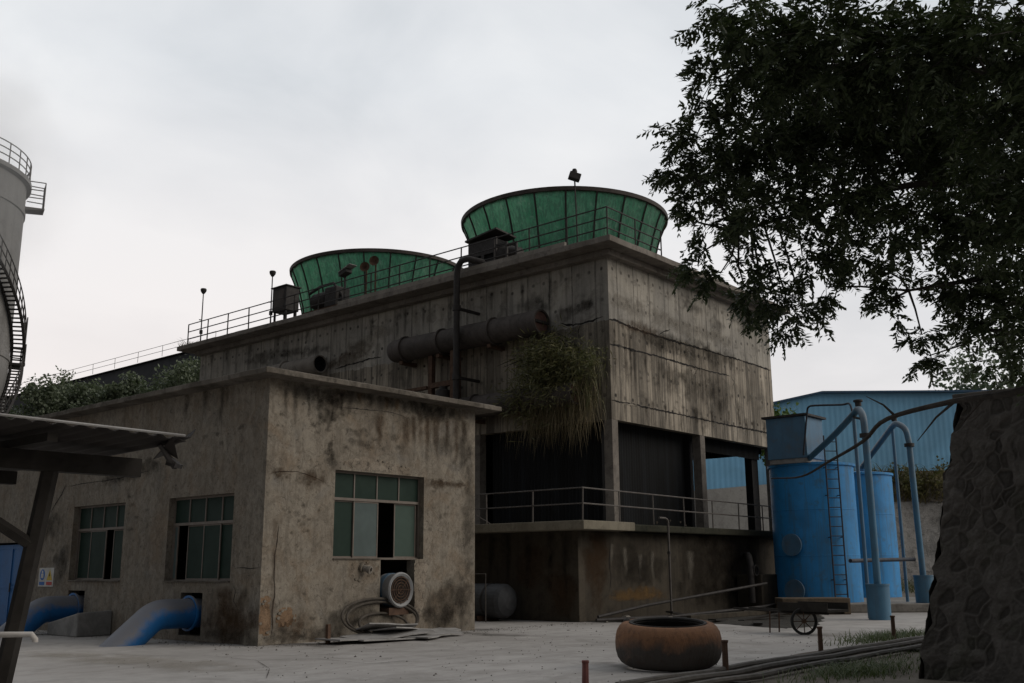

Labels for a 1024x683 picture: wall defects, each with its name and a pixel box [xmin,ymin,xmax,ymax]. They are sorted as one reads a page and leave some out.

crack [207,529,280,678]